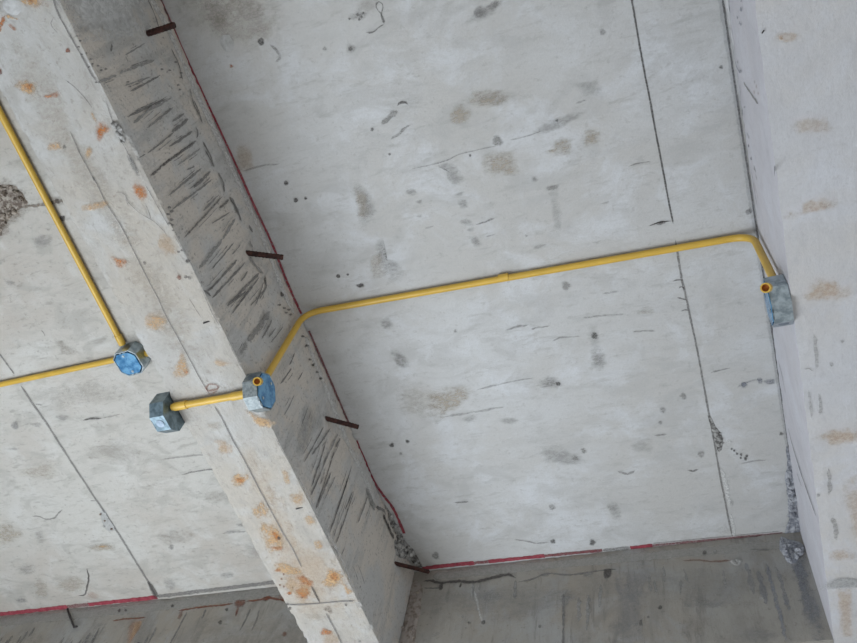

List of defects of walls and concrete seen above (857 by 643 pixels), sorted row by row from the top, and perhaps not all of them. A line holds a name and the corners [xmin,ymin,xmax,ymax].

corrosion [277,564,311,598]
spalling [303,416,359,555]
spalling [358,488,430,574]
spalling [779,446,805,564]